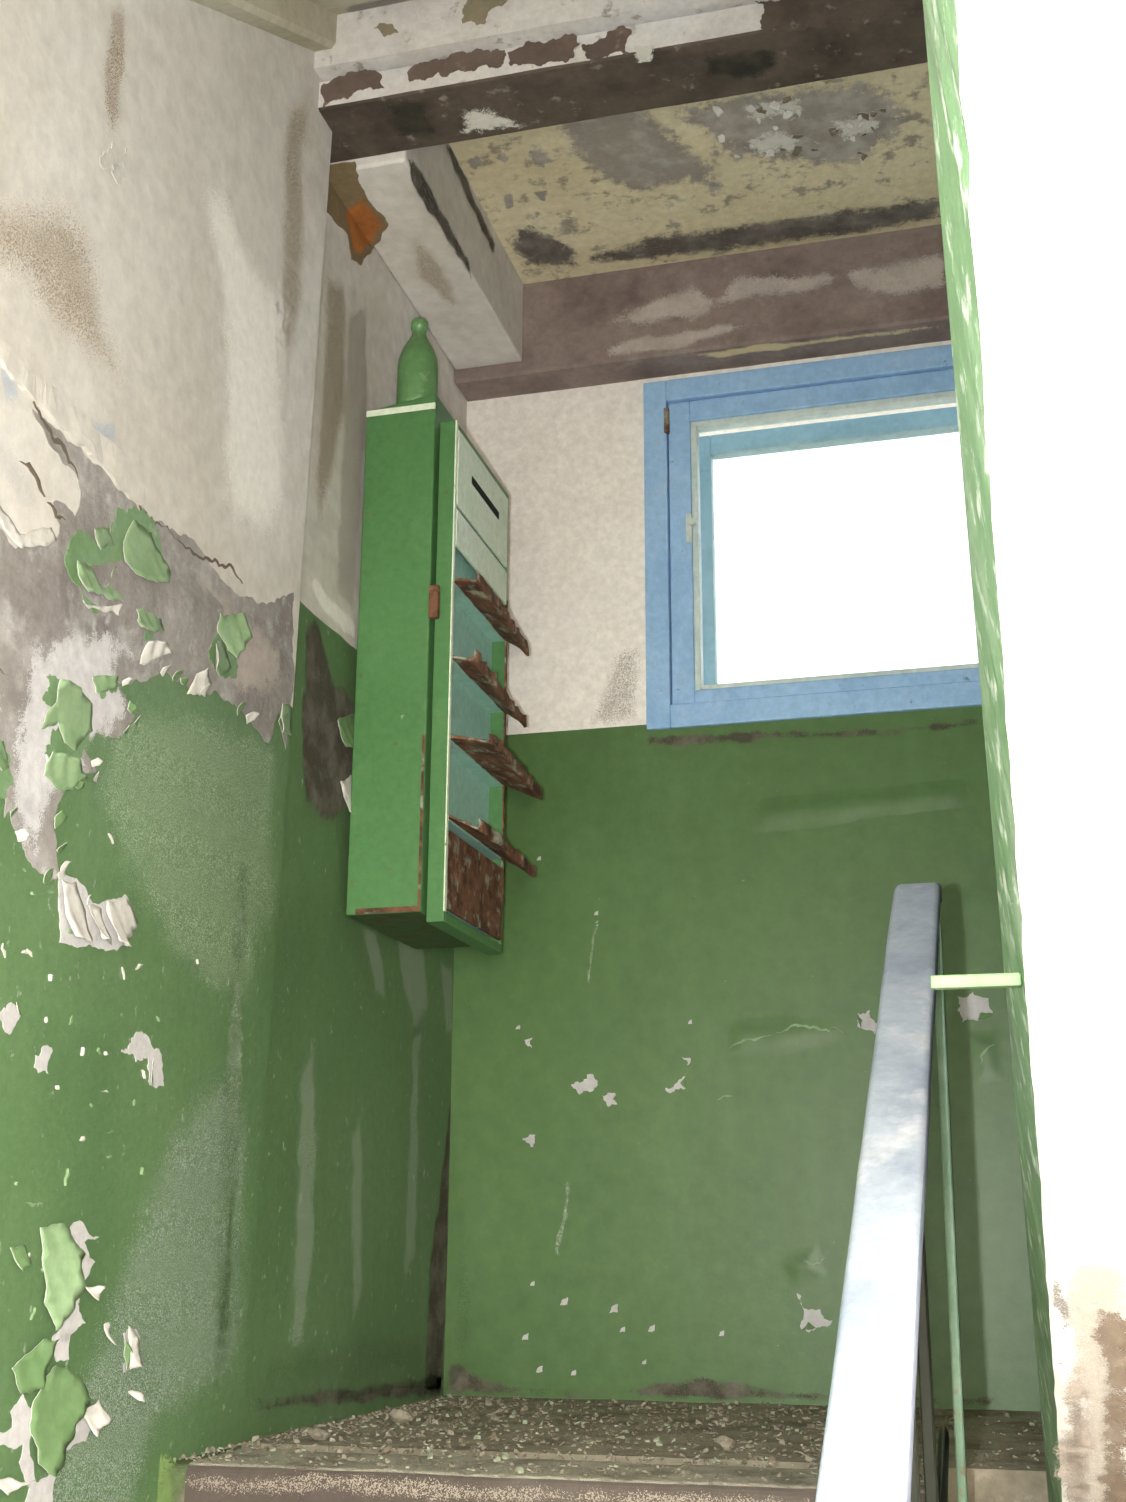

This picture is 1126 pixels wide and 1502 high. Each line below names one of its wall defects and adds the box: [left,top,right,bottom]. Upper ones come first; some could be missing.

peeling [320,69,384,109]
peeling [407,26,658,82]
damp [701,46,778,82]
rust [327,161,389,266]
damp [408,158,472,311]
damp [375,98,941,268]
crack [0,339,243,584]
peeling [0,409,295,951]
peeling [0,1220,112,1502]
peeling [104,1322,144,1373]
damp [1051,1260,1126,1502]
peeling [1051,1309,1126,1502]